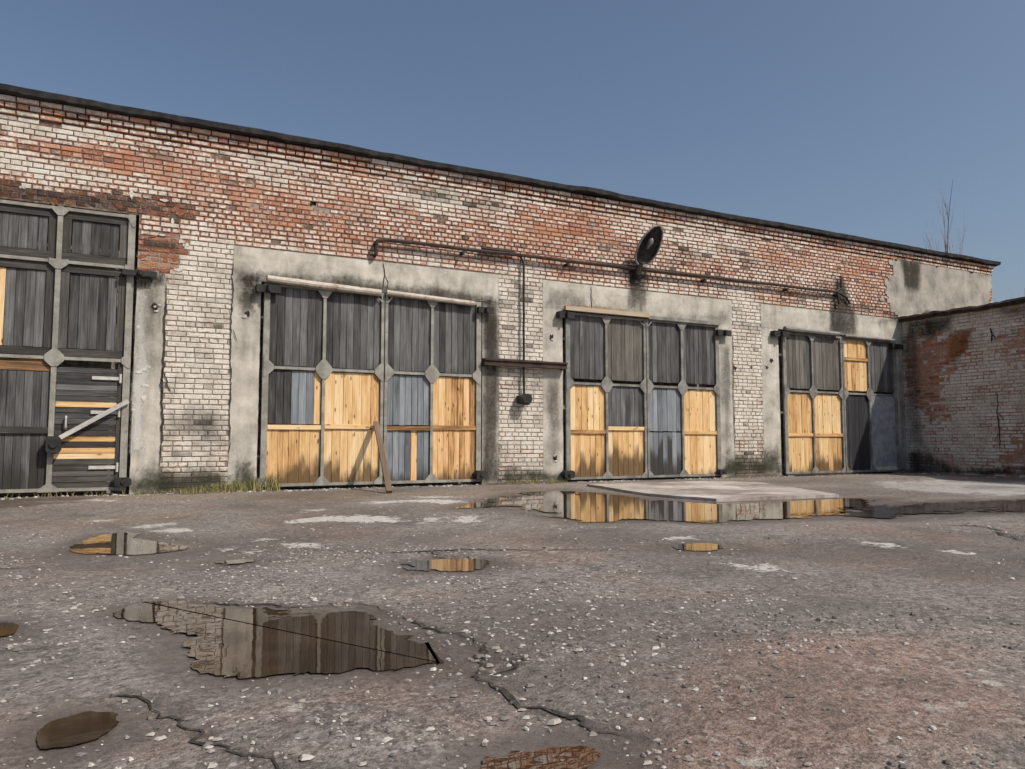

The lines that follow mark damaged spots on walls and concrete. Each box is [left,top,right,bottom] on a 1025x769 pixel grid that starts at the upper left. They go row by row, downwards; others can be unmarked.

spalling [0,180,198,277]
damp [830,281,855,335]
peeling [902,328,975,425]
peeling [988,430,1025,477]